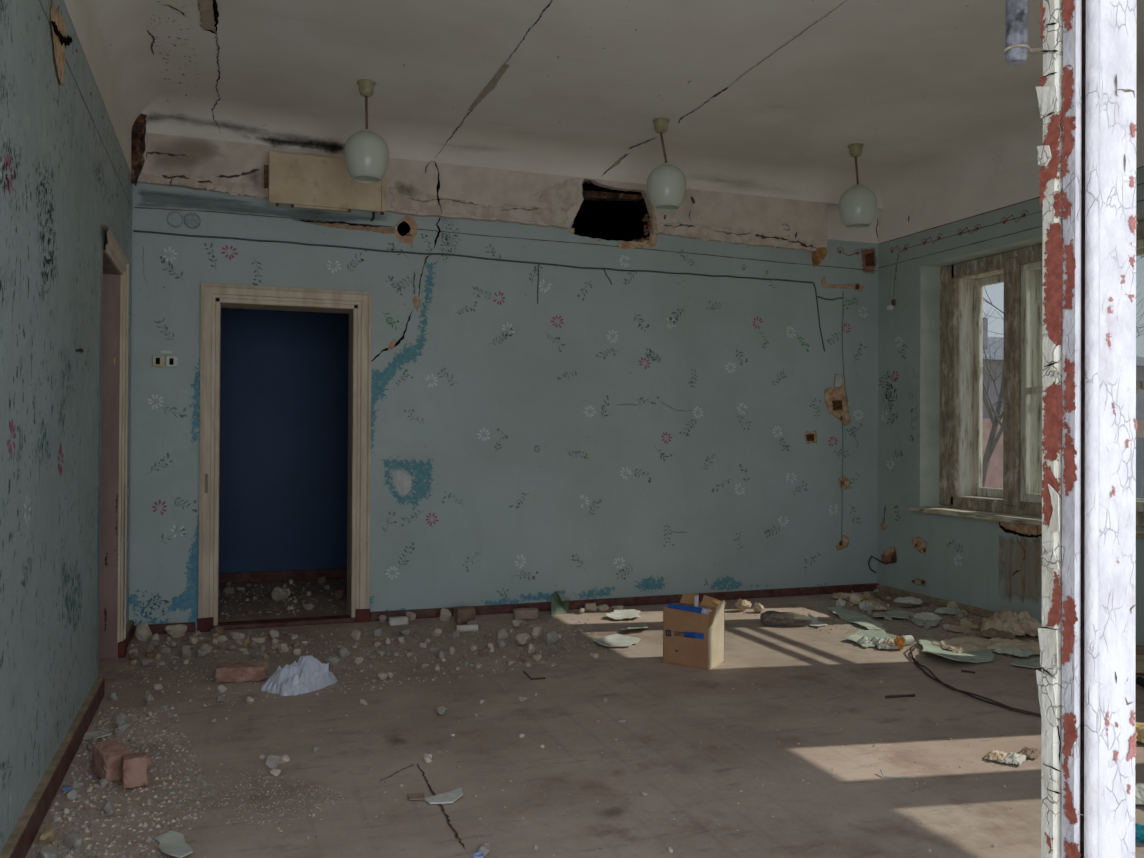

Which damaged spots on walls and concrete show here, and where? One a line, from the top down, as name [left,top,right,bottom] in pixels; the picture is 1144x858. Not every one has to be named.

crack [166,0,221,134]
crack [602,0,847,176]
peeling [1061,0,1075,31]
peeling [371,220,458,510]
crack [371,0,552,362]
spalling [569,180,827,266]
peeling [999,65,1077,538]
peeling [1108,215,1138,314]
peeling [1036,551,1078,825]
peeling [1104,710,1138,763]
crack [380,764,466,850]
peeling [1045,833,1081,858]